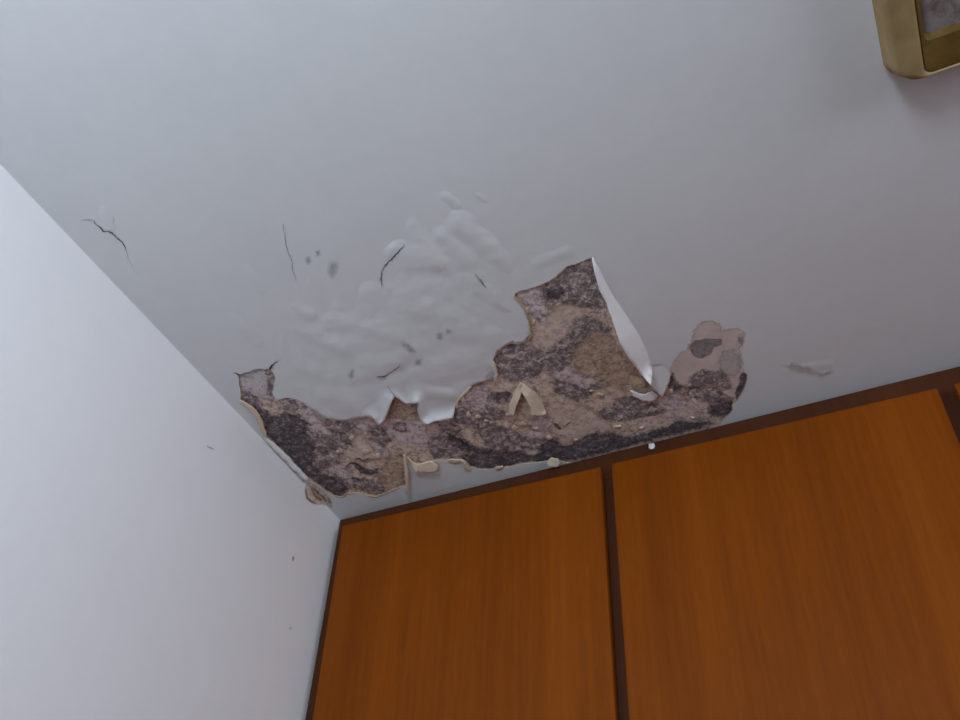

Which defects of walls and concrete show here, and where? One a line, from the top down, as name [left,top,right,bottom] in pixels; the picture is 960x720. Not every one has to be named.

crack [82,219,133,266]
crack [379,244,405,285]
peeling [239,257,747,508]